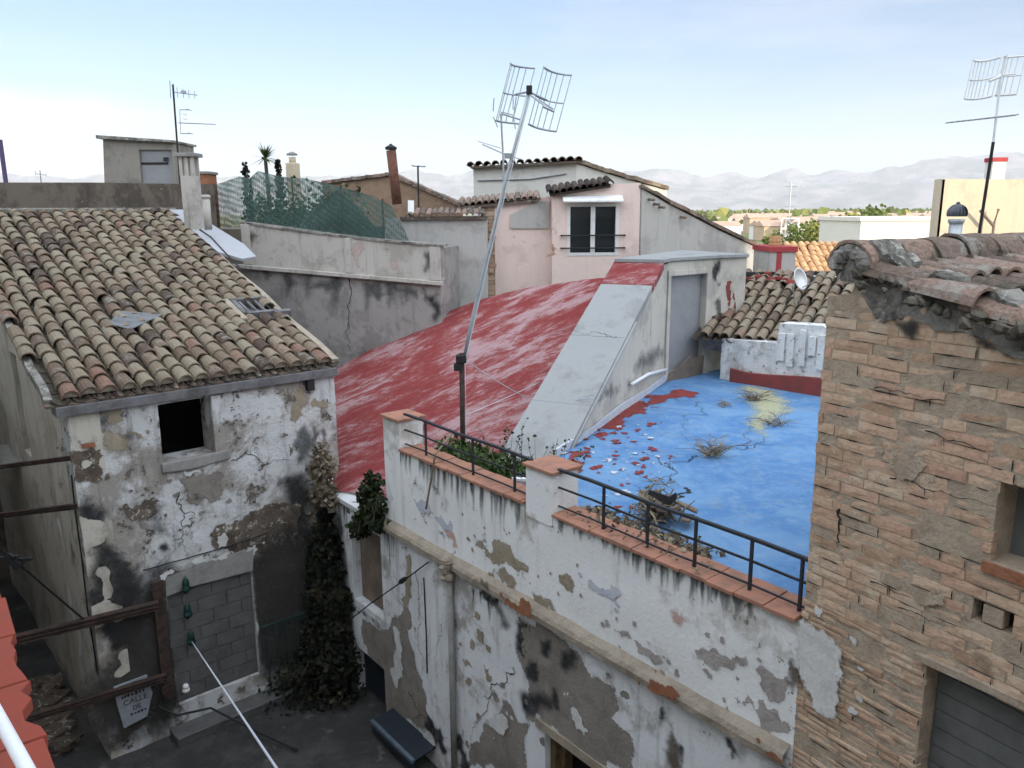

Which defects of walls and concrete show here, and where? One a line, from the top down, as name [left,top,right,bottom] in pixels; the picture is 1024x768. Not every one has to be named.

crack [344,278,352,357]
peeling [561,381,699,511]
damp [79,505,105,522]
crack [176,492,195,557]
peeling [160,499,313,580]
damp [253,474,312,674]
damp [602,539,752,610]
crack [835,508,843,547]
damp [73,541,185,750]
crack [472,668,515,732]
peeling [458,532,680,768]
peeling [695,606,863,766]